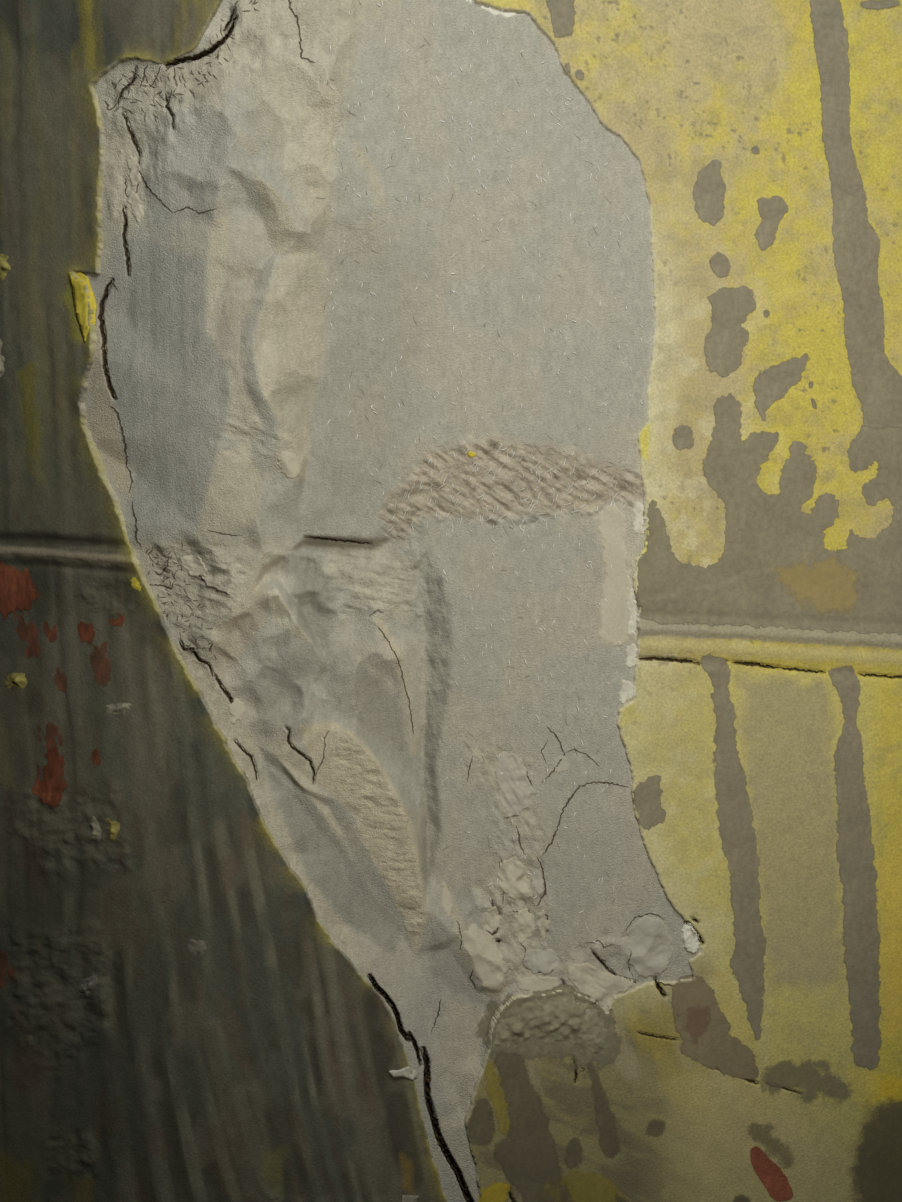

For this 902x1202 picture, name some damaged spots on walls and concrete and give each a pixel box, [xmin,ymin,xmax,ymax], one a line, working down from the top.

crack [288,0,316,63]
crack [98,10,236,595]
peeling [636,0,902,635]
crack [307,536,369,544]
spalling [69,0,770,1202]
crack [639,657,826,673]
crack [859,671,902,679]
crack [456,727,628,988]
crack [586,913,704,997]
peeling [829,666,882,1070]
crack [369,976,474,1202]
peeling [761,1061,850,1101]